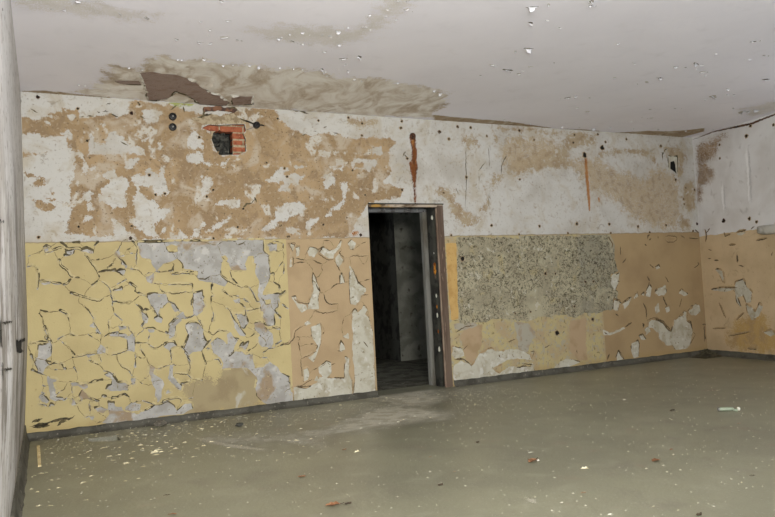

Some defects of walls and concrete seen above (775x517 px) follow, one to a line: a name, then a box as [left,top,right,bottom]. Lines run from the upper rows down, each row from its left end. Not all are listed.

water stain [22,54,562,179]
peeling [17,82,404,423]
rust [409,137,418,202]
rust [584,158,600,211]
water stain [565,128,728,236]
peeling [645,222,763,320]
peeling [722,216,758,246]